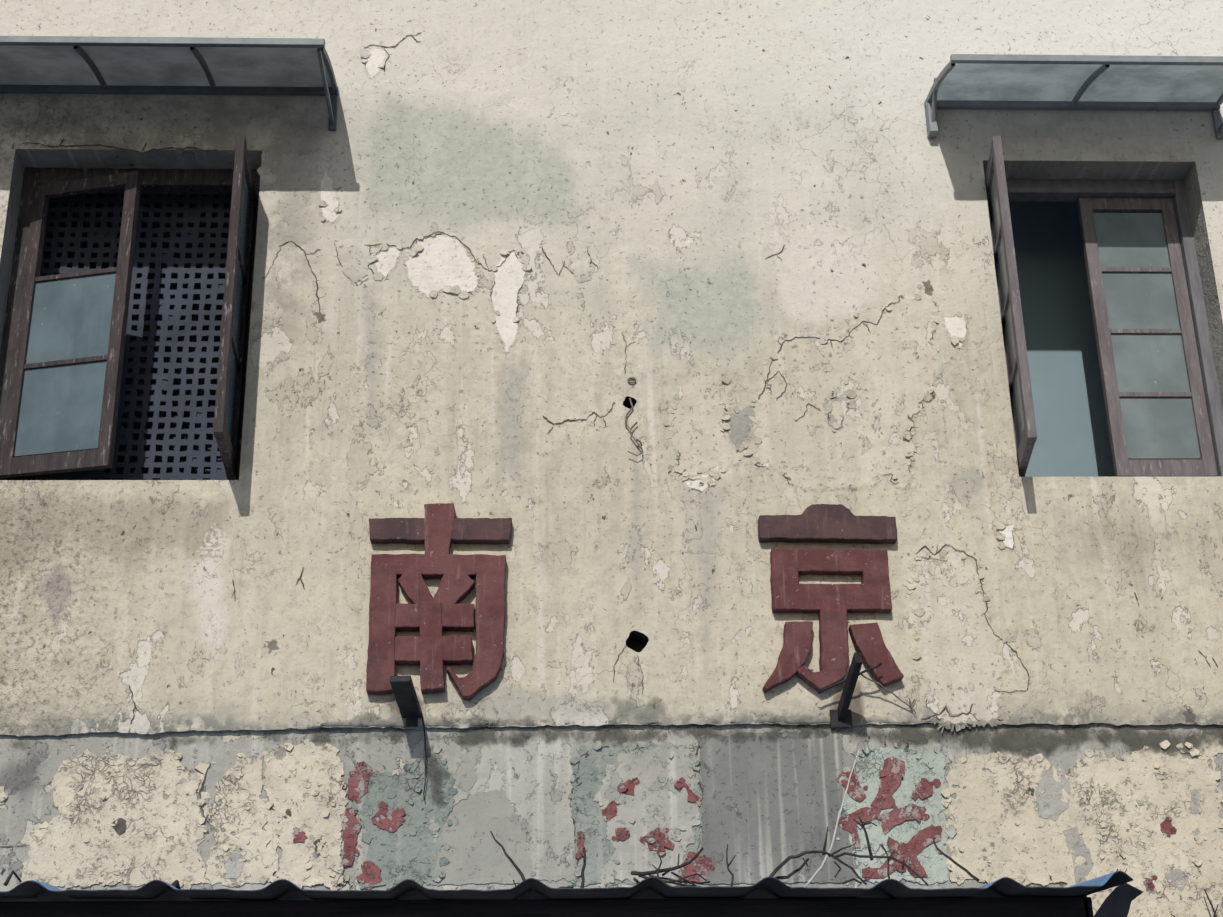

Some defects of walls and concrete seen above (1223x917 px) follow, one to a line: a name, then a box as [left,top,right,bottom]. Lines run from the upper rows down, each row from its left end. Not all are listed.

peeling [360,45,388,80]
damp [257,72,611,274]
crack [259,230,512,314]
peeling [367,232,532,354]
crack [542,246,604,276]
crack [542,334,637,434]
crack [753,308,886,421]
crack [911,538,1037,720]
peeling [21,551,1223,917]